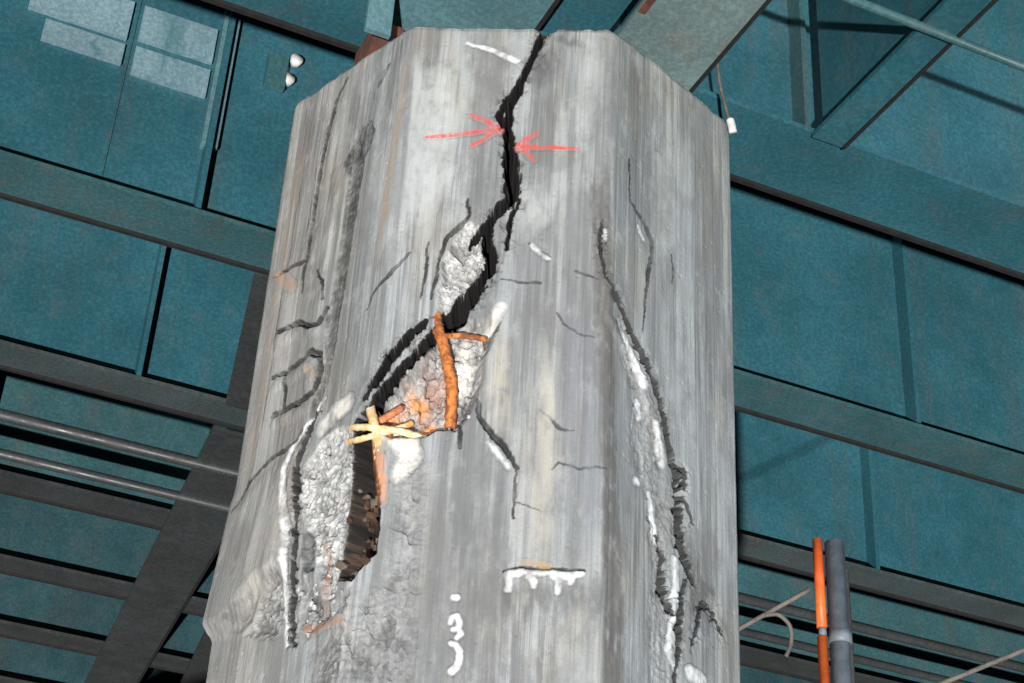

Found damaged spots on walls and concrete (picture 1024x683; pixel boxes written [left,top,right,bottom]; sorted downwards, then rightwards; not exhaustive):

crack [231,76,349,645]
spalling [309,118,376,422]
spalling [215,220,503,683]
rust [370,347,459,518]
crack [356,34,549,433]
crack [458,398,529,519]
peeling [484,439,513,471]
leakage [350,28,666,683]
crack [502,564,587,572]
crack [590,158,720,683]